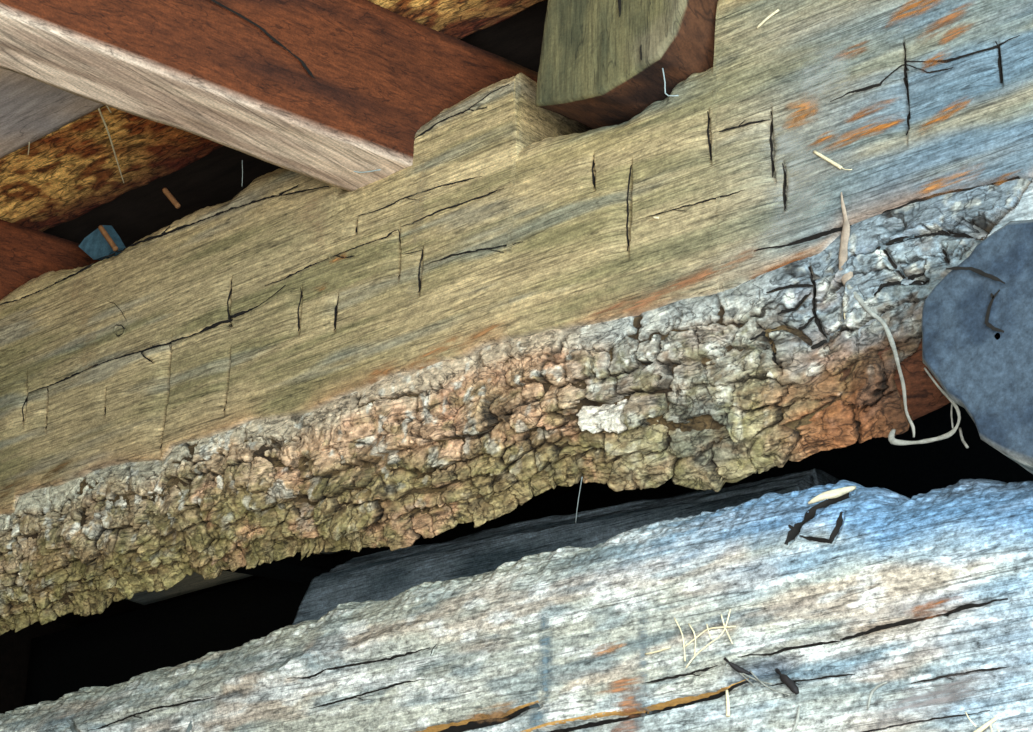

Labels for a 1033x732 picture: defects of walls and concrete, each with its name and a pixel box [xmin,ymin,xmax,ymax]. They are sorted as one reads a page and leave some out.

crack [830,35,1020,102]
crack [0,176,523,393]
crack [287,644,437,709]
crack [416,598,1008,732]